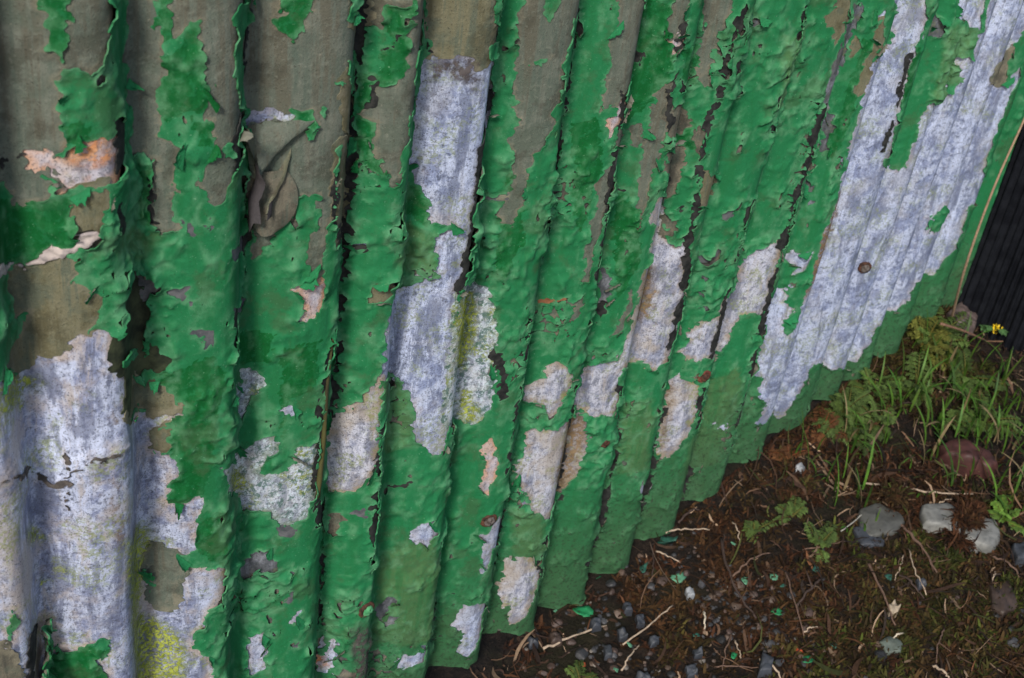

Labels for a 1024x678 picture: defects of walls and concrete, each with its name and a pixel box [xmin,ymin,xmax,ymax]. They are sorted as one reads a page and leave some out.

rust [69,138,110,165]
peeling [0,248,226,678]
peeling [0,0,580,538]
peeling [450,512,542,660]
peeling [512,0,1024,520]